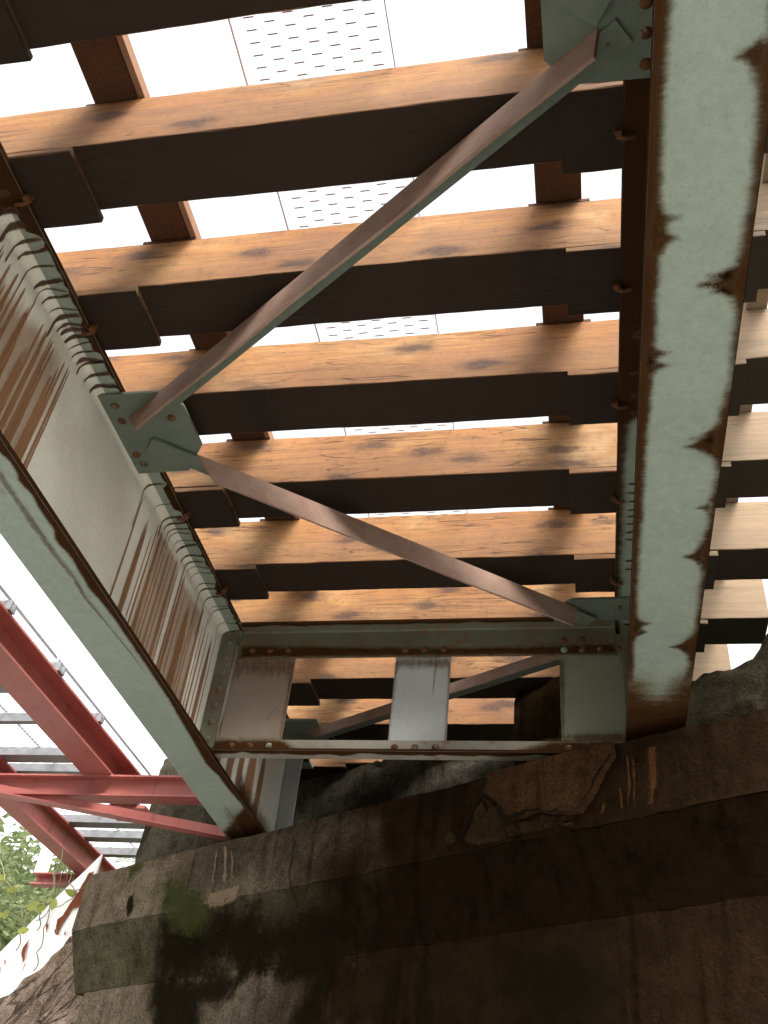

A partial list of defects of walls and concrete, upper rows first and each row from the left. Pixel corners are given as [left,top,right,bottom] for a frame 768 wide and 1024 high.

leakage [148,899,350,1024]
corrosion [0,142,623,840]
peeling [444,740,616,845]
corrosion [614,0,768,742]